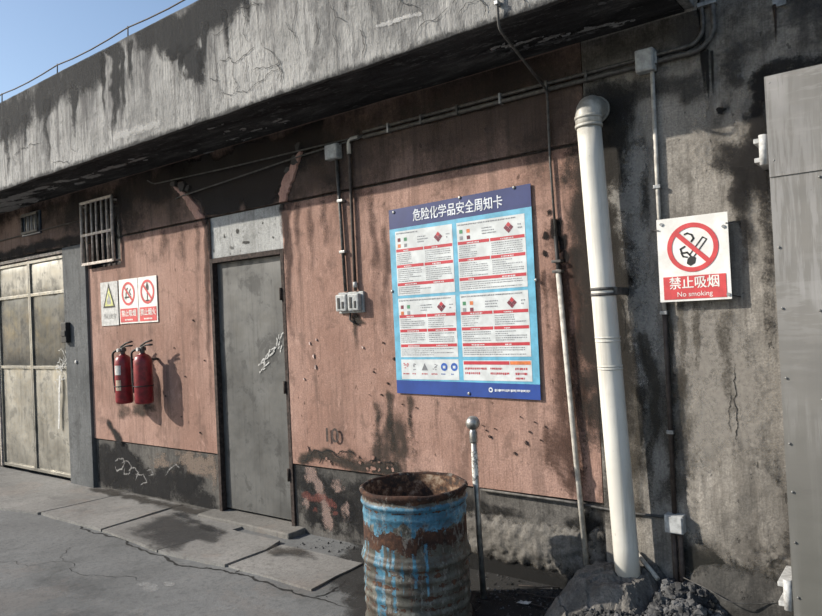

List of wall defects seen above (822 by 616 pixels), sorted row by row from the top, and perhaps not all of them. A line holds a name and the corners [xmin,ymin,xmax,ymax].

water stain [0,0,250,165]
crack [209,1,282,95]
crack [285,3,365,54]
spalling [170,181,205,220]
spalling [278,142,303,203]
water stain [697,0,774,306]
water stain [541,145,605,499]
water stain [586,79,700,518]
crack [728,367,738,441]
water stain [98,420,225,550]
peeling [297,446,402,530]
crack [80,526,348,608]